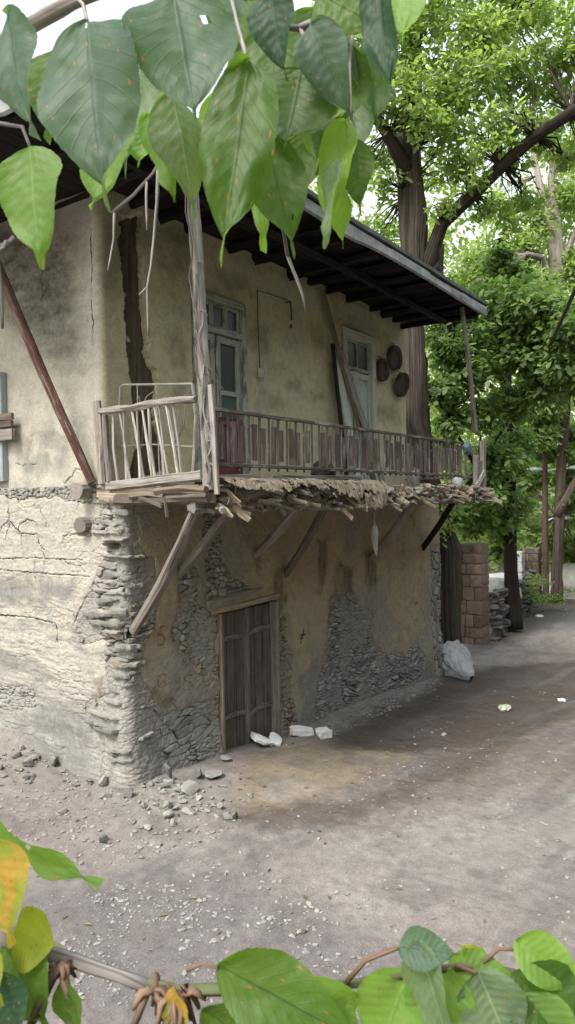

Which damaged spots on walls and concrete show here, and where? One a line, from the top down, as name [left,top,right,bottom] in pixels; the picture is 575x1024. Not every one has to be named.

flaking render [118,216,161,478]
crack [0,608,81,641]
crack [0,498,88,578]
flaking render [0,479,222,788]
flaking render [279,611,297,730]
flaking render [315,544,444,721]